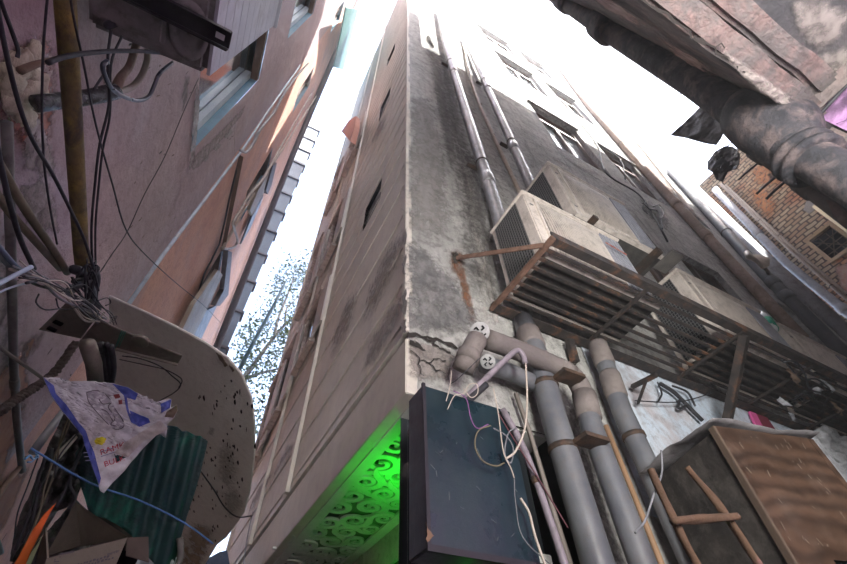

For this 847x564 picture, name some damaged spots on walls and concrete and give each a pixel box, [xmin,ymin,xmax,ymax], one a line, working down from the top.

leakage [428,35,497,302]
rust [451,252,473,320]
crack [408,332,458,376]